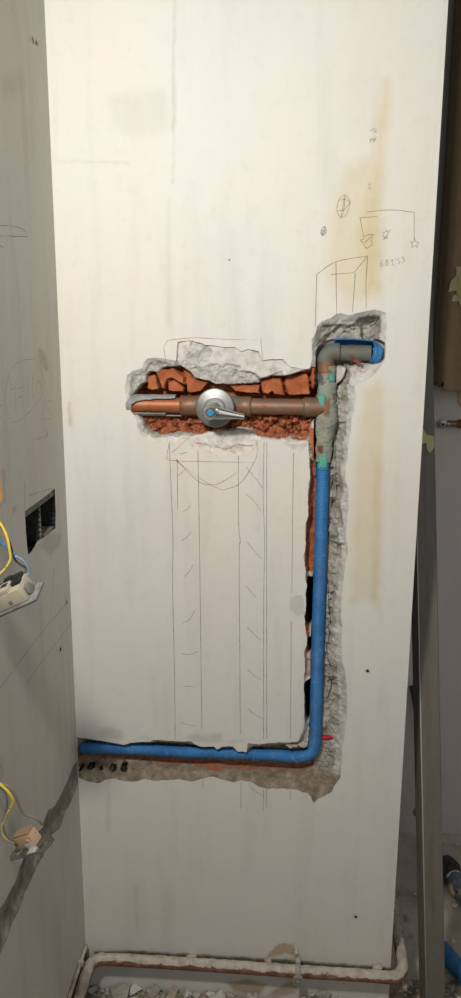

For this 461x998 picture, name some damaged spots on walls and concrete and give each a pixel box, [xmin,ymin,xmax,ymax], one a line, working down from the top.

spalling [125,310,387,400]
spalling [132,411,313,457]